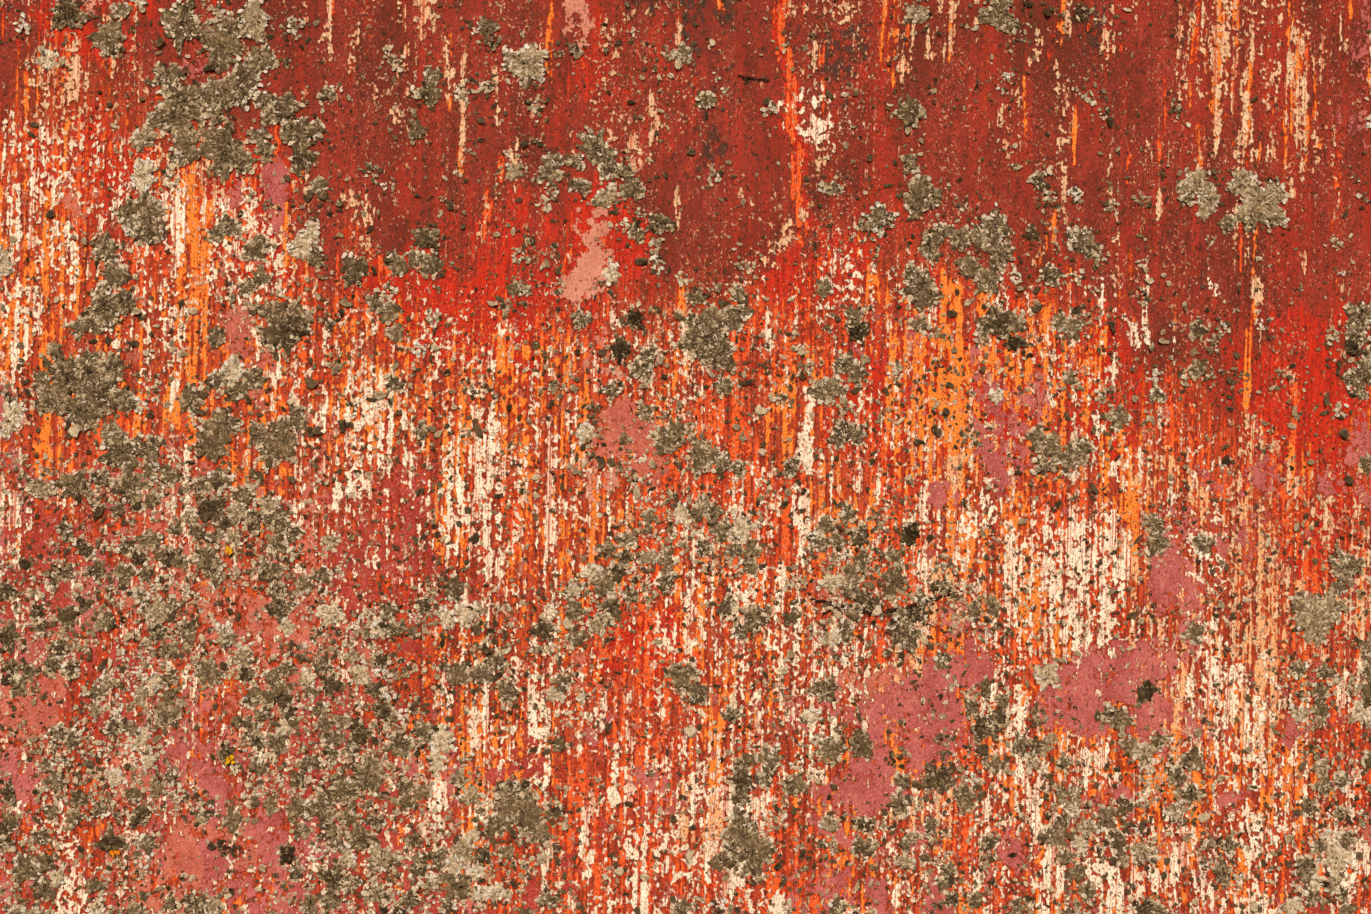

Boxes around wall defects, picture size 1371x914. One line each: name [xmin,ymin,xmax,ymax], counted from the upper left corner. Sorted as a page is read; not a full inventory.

peeling [468,85,577,260]
peeling [1133,118,1177,176]
peeling [340,141,416,289]
peeling [1133,180,1178,234]
peeling [1264,366,1336,415]